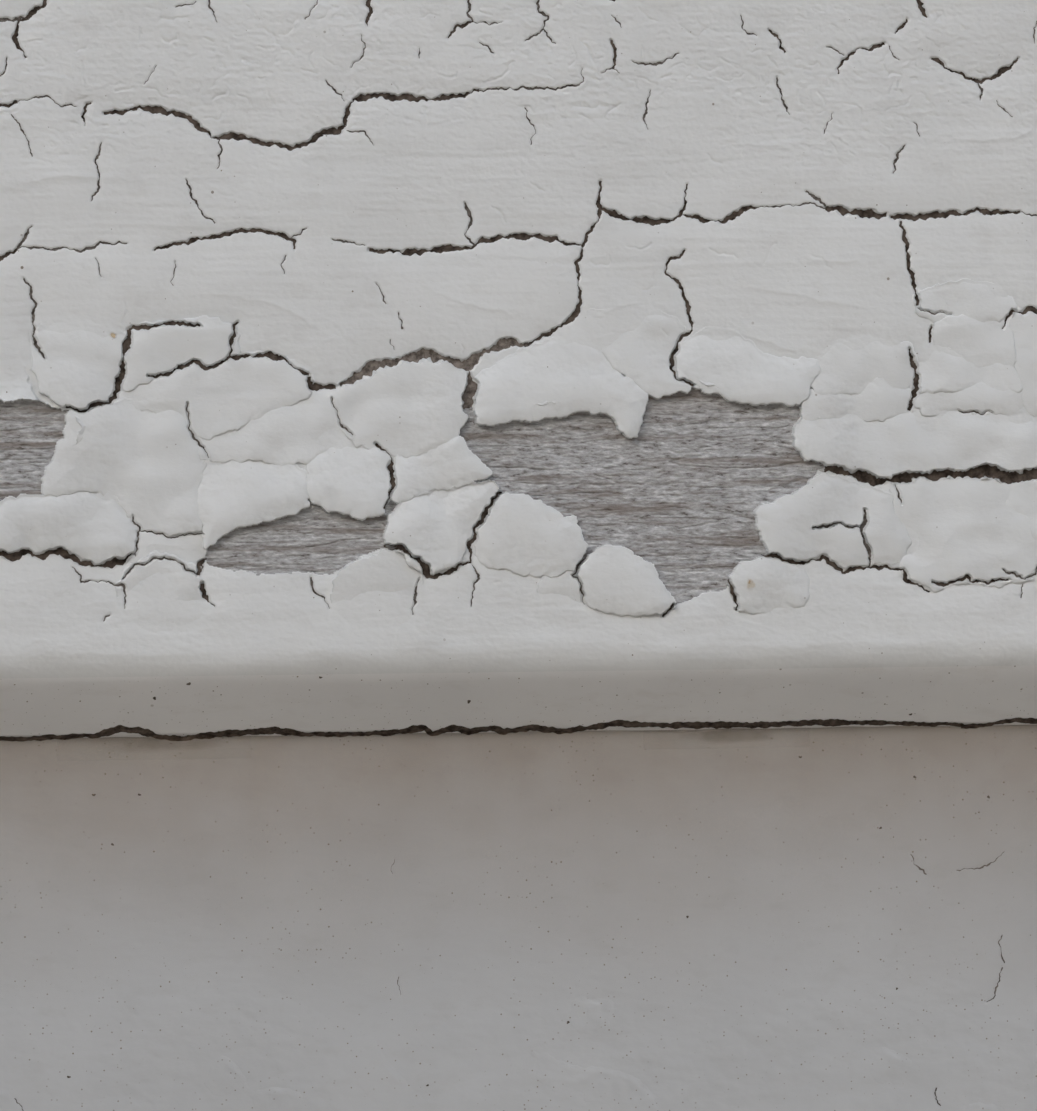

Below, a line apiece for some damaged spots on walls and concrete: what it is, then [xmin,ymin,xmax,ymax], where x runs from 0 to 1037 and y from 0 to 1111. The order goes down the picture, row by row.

crack [0,0,679,201]
crack [740,15,790,115]
crack [829,0,927,74]
crack [931,21,1037,117]
crack [0,226,127,359]
crack [66,179,1037,509]
peeling [0,309,912,617]
crack [0,516,215,621]
crack [384,491,502,615]
crack [727,579,738,611]
crack [761,461,1037,598]
crack [0,718,1037,742]